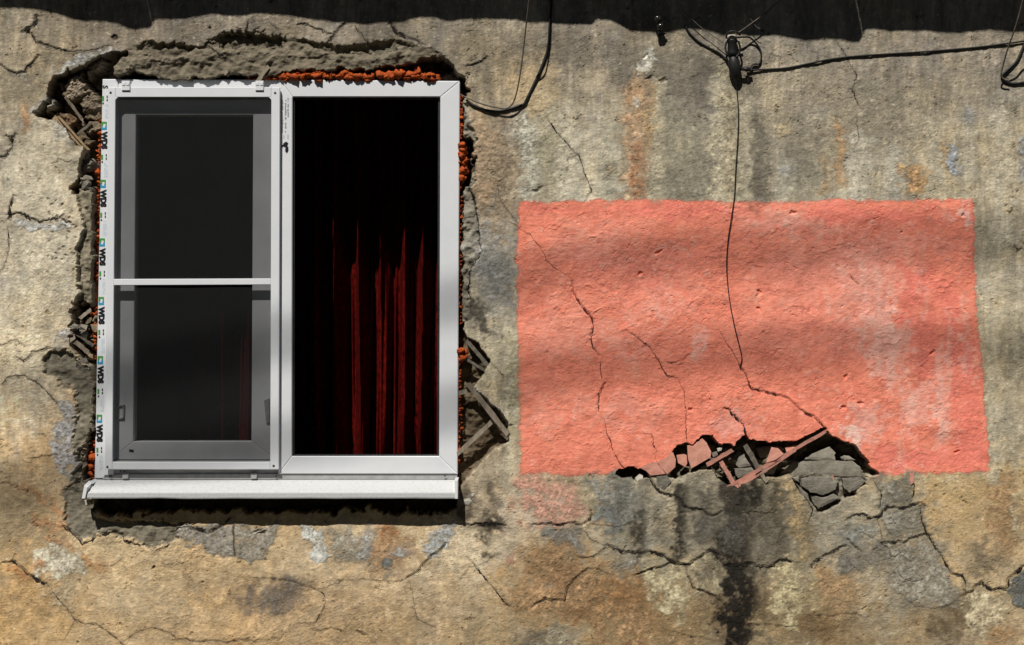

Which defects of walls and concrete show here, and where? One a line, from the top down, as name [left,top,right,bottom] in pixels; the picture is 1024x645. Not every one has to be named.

crack [1,16,109,74]
crack [2,199,67,270]
spalling [13,46,129,401]
spalling [457,90,541,506]
crack [467,179,624,468]
peeling [49,400,103,479]
crack [3,556,271,645]
crack [64,517,231,566]
peeling [421,521,456,558]
damp [670,474,777,645]
crack [468,483,1024,609]
spalling [515,427,1024,641]